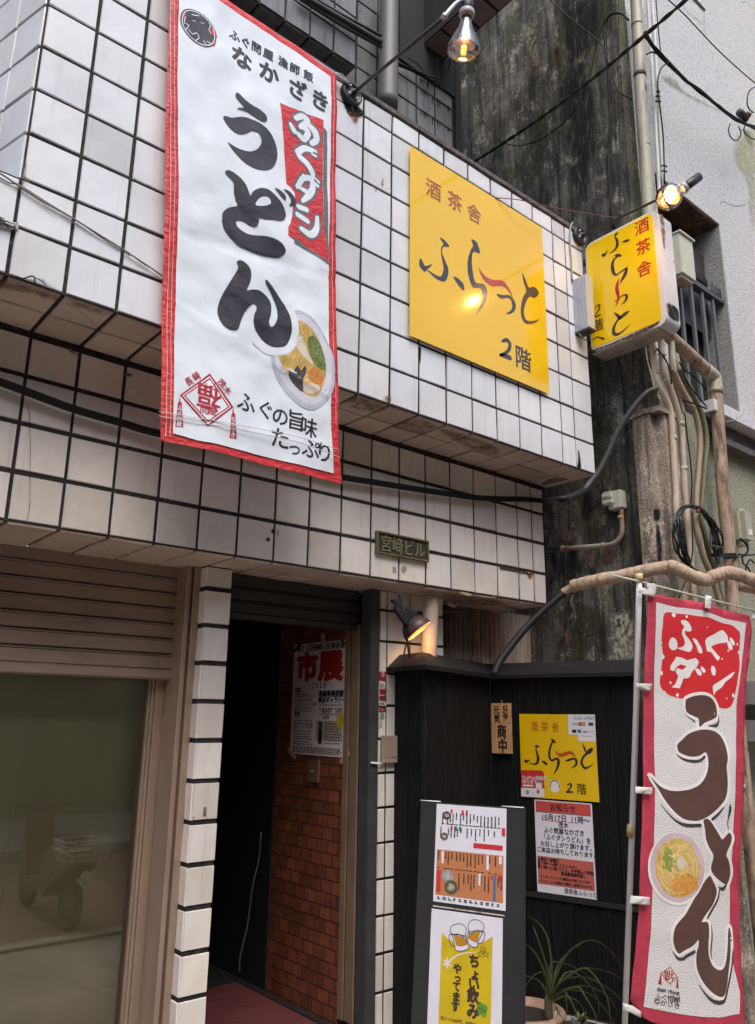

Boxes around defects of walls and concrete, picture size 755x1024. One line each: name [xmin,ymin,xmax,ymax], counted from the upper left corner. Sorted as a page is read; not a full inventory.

leakage [560,0,602,205]
leakage [609,613,634,660]